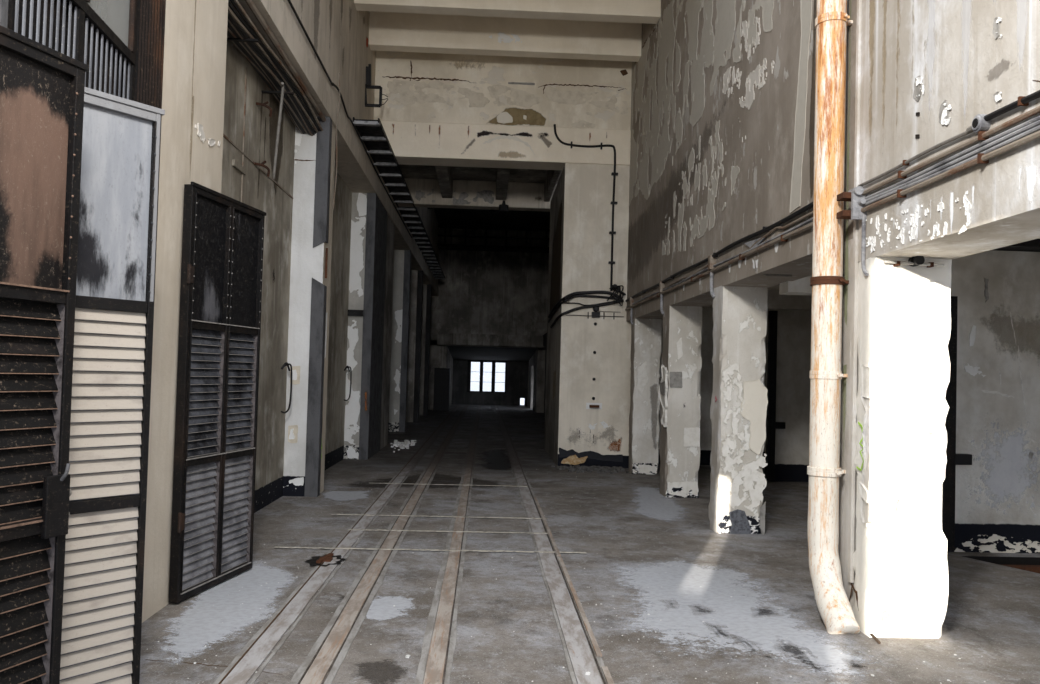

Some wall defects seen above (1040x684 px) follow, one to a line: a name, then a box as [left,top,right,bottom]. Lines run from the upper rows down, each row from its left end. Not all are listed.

peeling [487,85,543,124]
peeling [620,0,775,255]
peeling [789,0,812,213]
peeling [344,320,360,459]
peeling [720,363,768,534]
peeling [954,534,1040,565]